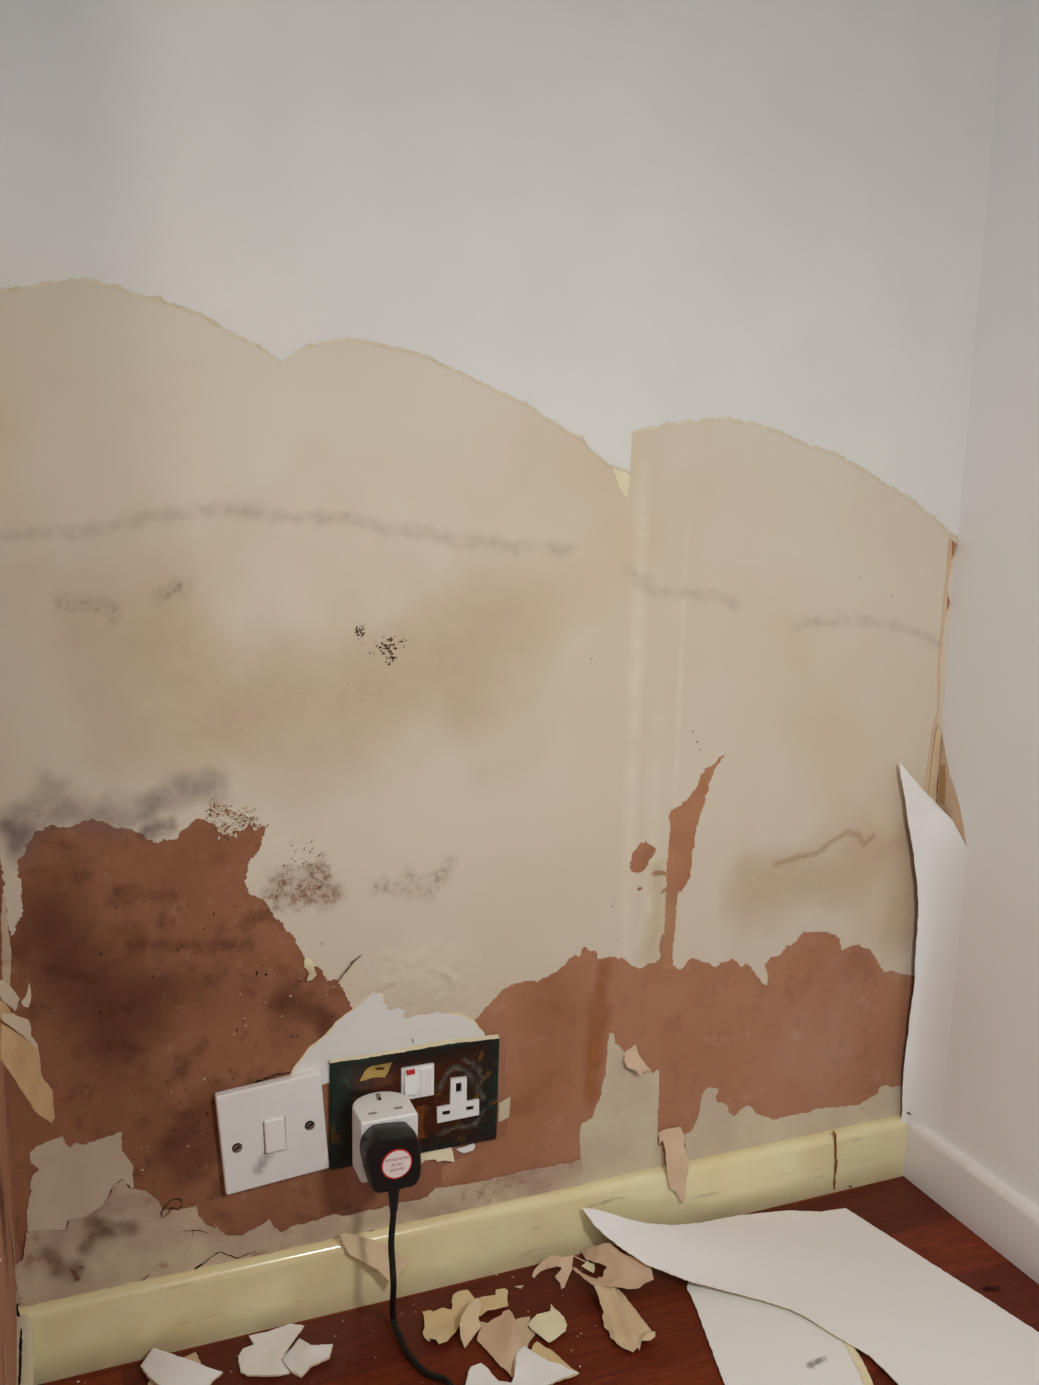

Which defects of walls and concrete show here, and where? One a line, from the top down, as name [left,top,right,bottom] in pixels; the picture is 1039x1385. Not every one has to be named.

leakage [271,867,338,903]
flaking render [0,723,968,1308]
crack [831,1131,839,1190]